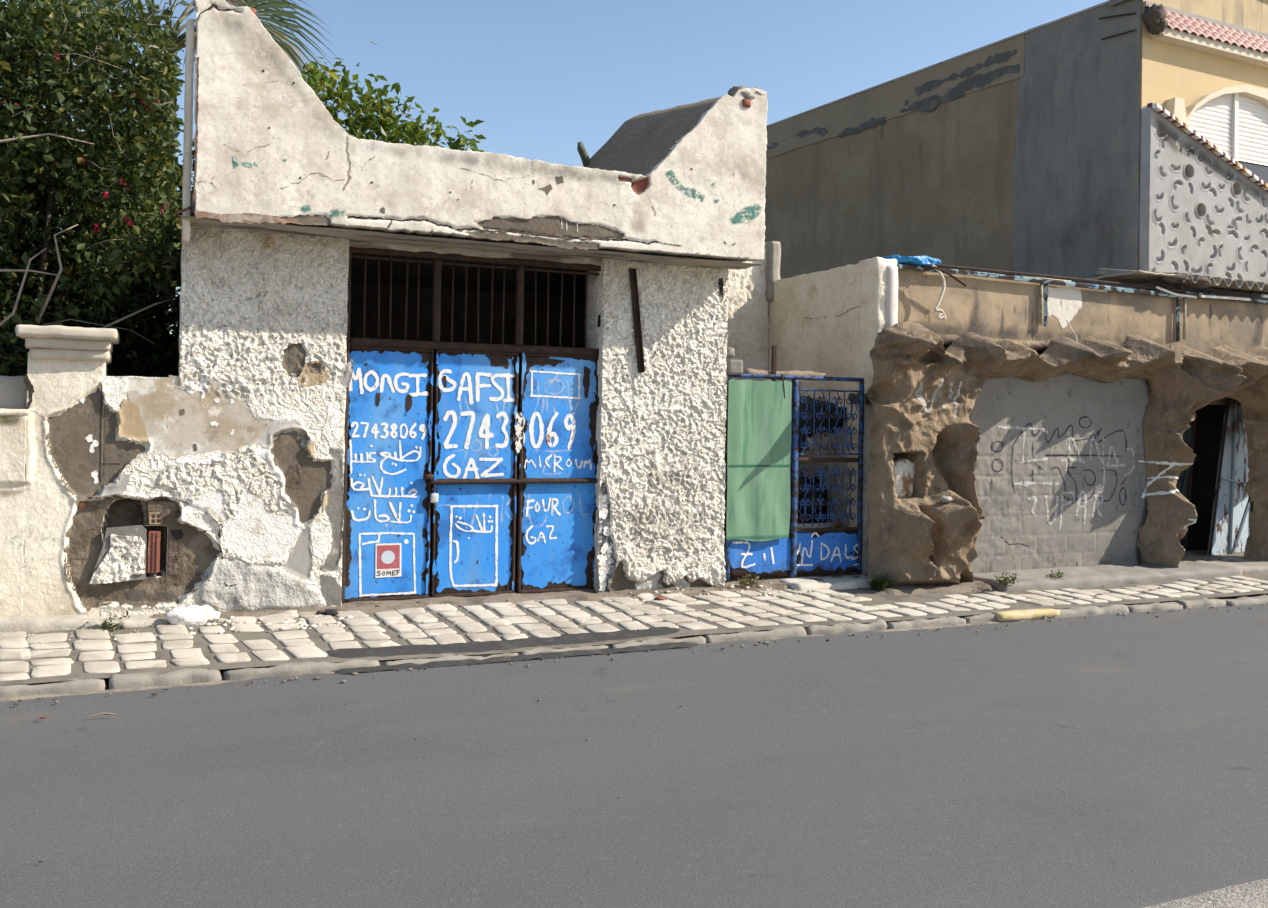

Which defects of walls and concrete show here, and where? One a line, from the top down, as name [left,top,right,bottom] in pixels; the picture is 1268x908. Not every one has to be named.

crack [281,136,682,246]
spalling [459,216,624,250]
flaking render [618,176,649,195]
peeling [283,344,330,387]
corrosion [629,268,645,373]
peeling [46,375,342,611]
peeling [597,481,717,601]